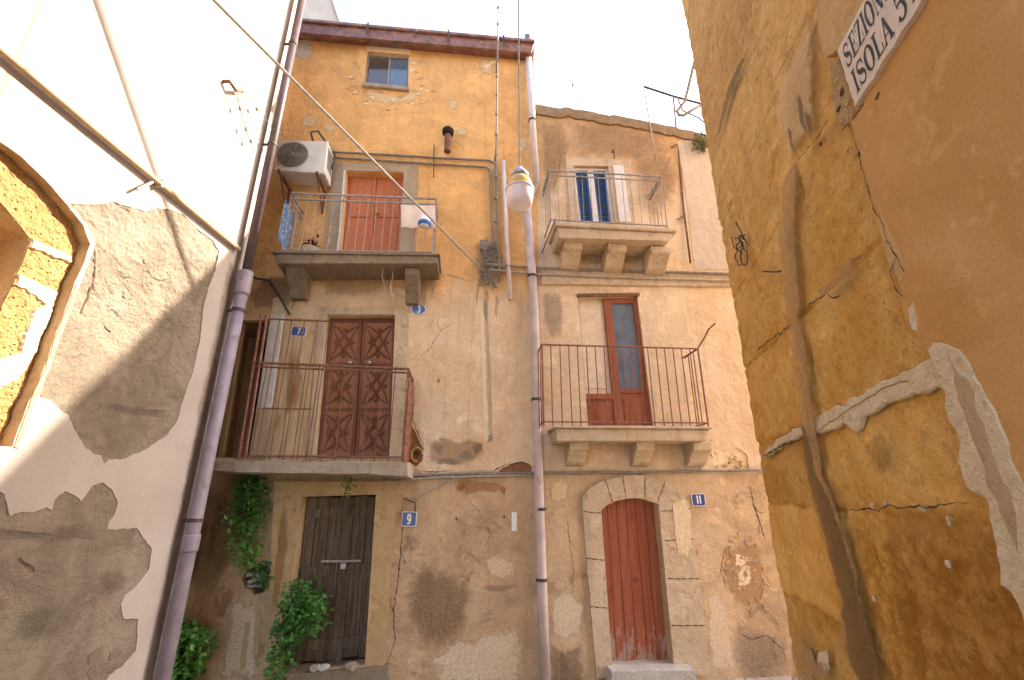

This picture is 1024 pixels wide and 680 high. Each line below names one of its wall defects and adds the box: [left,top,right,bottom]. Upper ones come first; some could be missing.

peeling [346,61,436,111]
crack [783,120,910,308]
flaking render [39,202,219,463]
leakage [432,439,482,464]
crack [749,487,766,541]
flaking render [764,342,1024,619]
crack [846,502,966,513]
flaking render [0,483,151,680]
crack [388,501,405,660]
leakage [413,571,465,640]
flaking render [723,532,766,617]